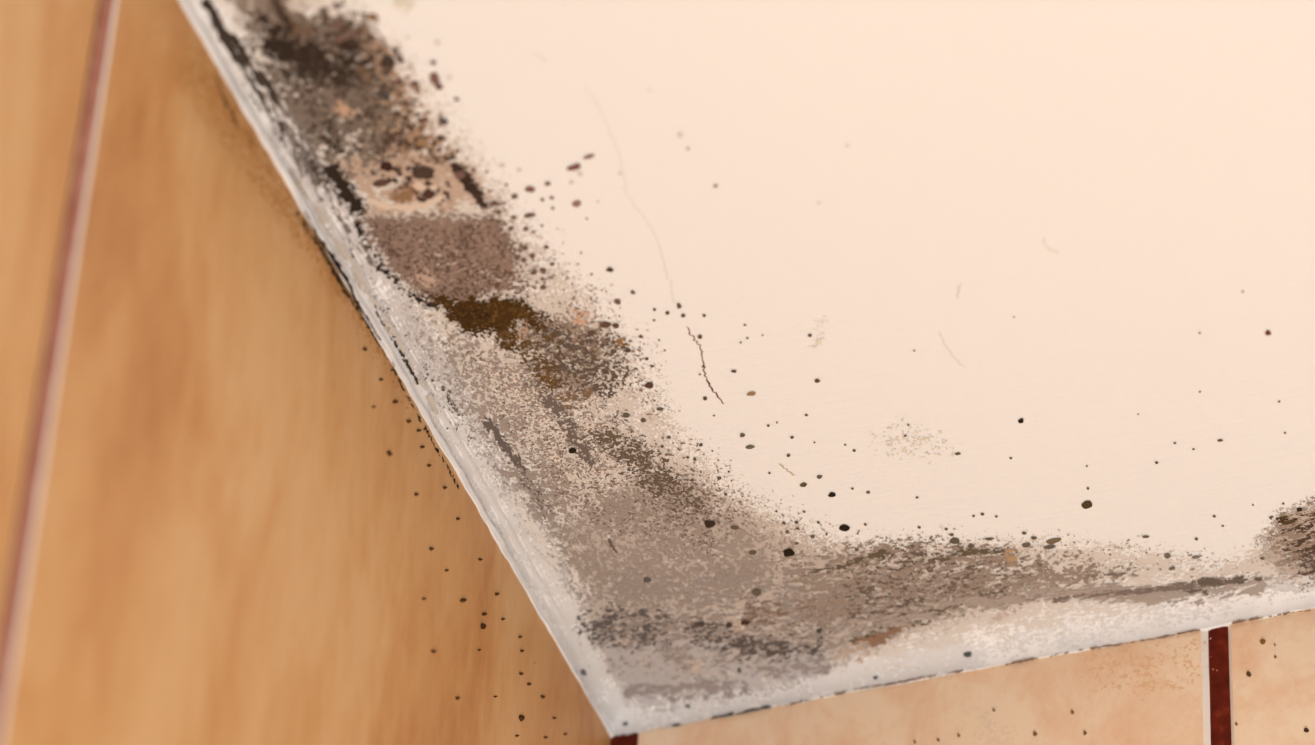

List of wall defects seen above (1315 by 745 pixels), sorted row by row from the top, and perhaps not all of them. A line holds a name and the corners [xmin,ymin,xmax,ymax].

damp [566,154,594,184]
damp [166,37,421,423]
damp [844,416,961,464]
damp [1232,610,1311,624]
damp [1088,629,1207,701]